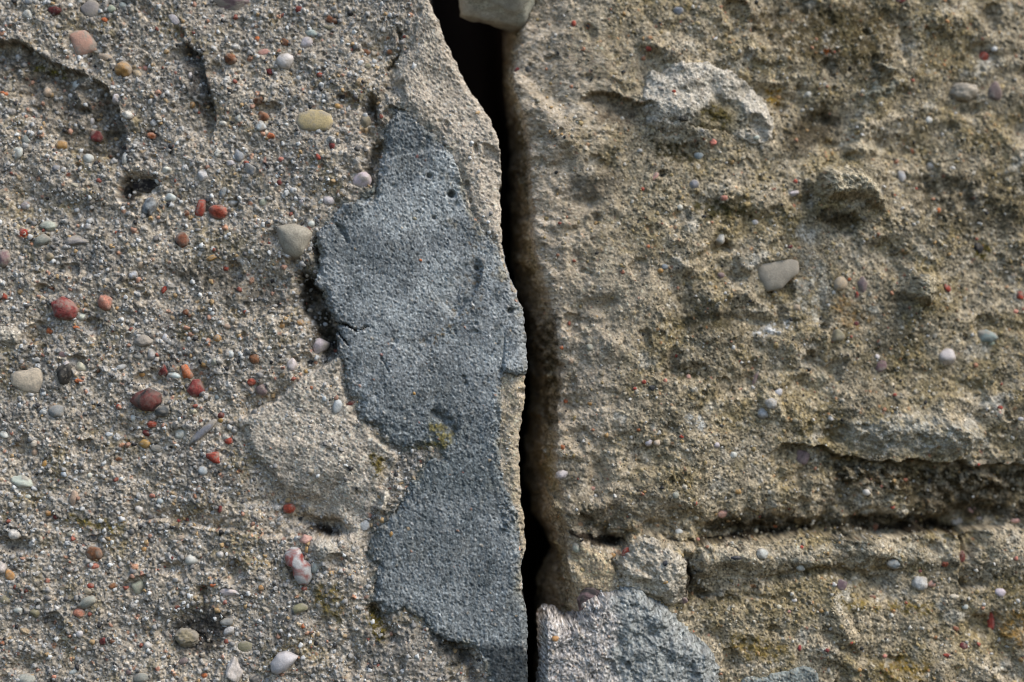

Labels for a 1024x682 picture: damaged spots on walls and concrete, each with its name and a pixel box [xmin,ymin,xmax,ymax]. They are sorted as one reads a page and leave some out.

crack [431,0,518,298]
crack [308,524,339,535]
crack [518,325,625,682]
crack [686,526,804,591]
crack [852,518,955,537]